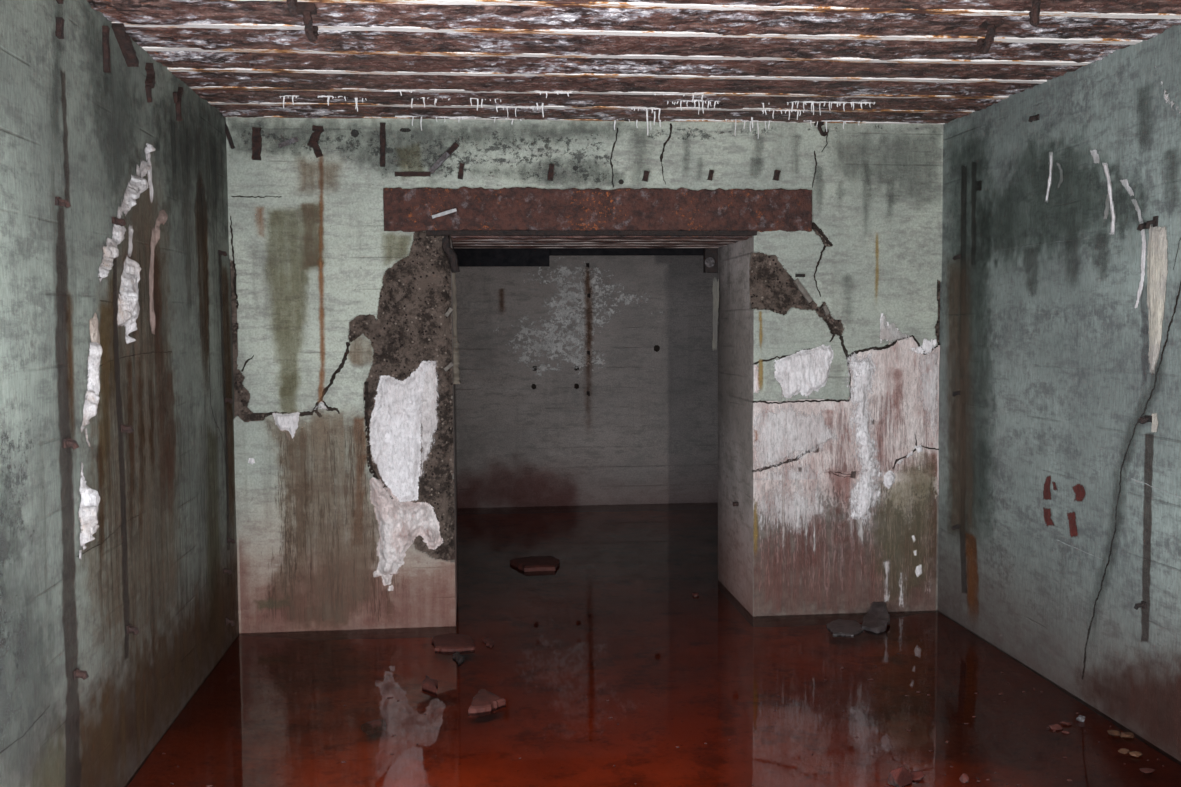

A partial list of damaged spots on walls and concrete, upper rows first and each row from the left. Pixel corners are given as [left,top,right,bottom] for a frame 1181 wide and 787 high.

leakage [98,143,168,344]
crack [197,171,281,500]
crack [267,342,393,499]
spalling [349,231,455,561]
leakage [495,257,648,390]
spalling [749,252,844,336]
crack [752,442,852,478]
crack [812,222,833,297]
leakage [754,345,936,606]
peeling [752,280,940,521]
crack [753,334,940,366]
leakage [880,313,938,432]